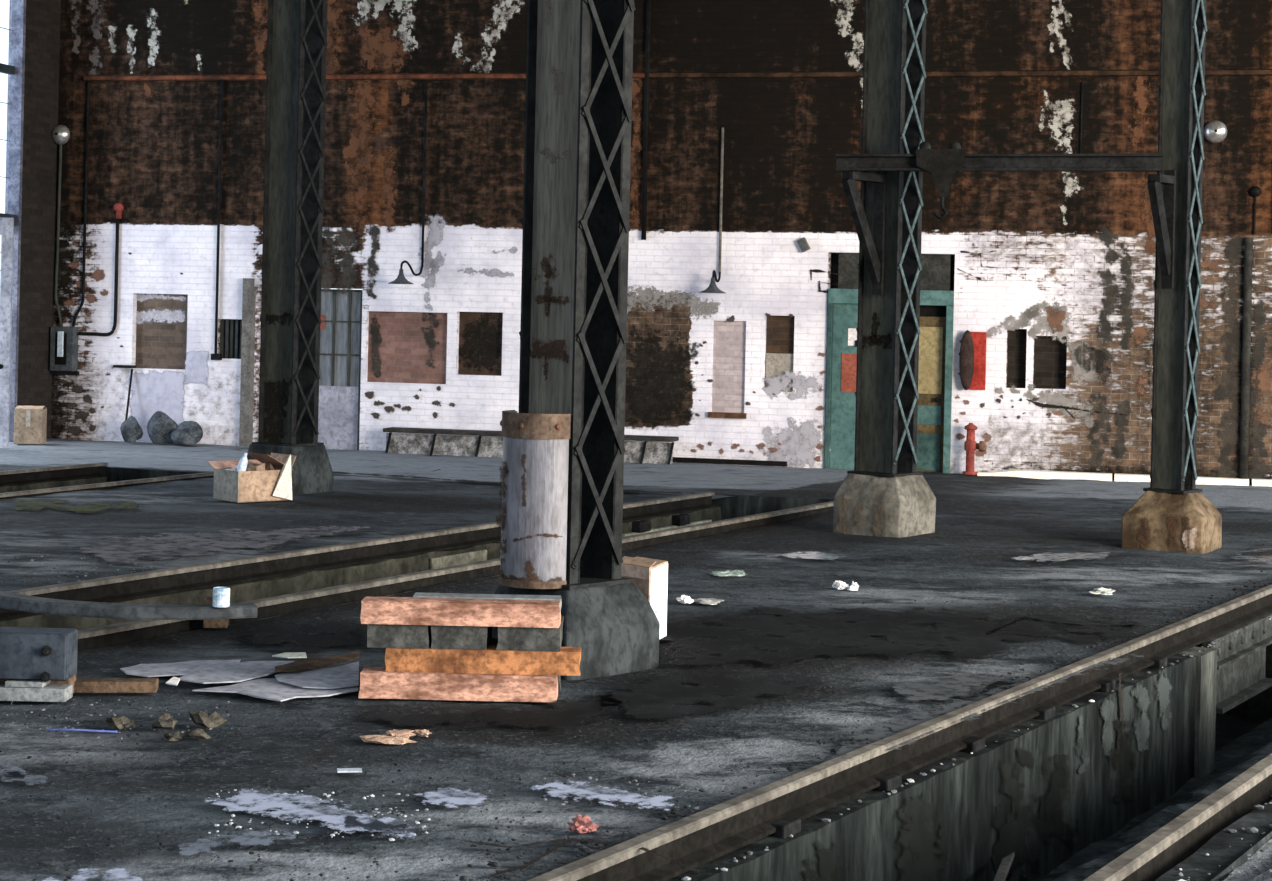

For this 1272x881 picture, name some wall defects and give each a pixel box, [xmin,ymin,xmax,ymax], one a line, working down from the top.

rust [326,0,415,233]
peeling [64,243,108,316]
spalling [1201,257,1223,273]
peeling [56,379,104,436]
water stain [1074,226,1135,468]
spalling [1255,359,1272,424]
rust [496,454,563,582]
spalling [667,612,1272,881]